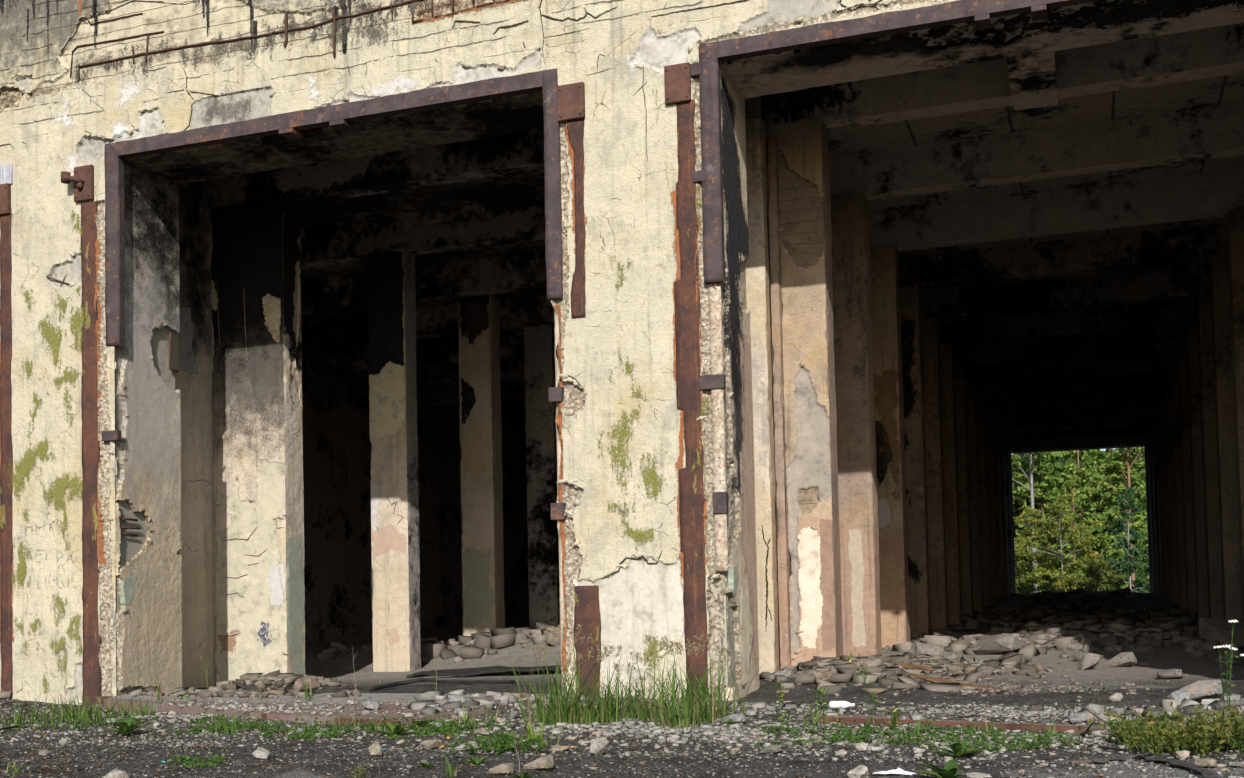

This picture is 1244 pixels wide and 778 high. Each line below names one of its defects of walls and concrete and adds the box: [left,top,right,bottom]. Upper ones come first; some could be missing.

crack [55,0,197,60]
crack [167,68,271,131]
peeling [0,0,515,113]
damp [72,0,475,140]
damp [8,286,86,521]
spalling [96,200,153,696]
corrosion [554,305,564,503]
peeling [552,121,684,697]
damp [598,357,657,551]
corrosion [670,191,702,381]
corrosion [675,392,708,575]
spalling [627,0,947,697]